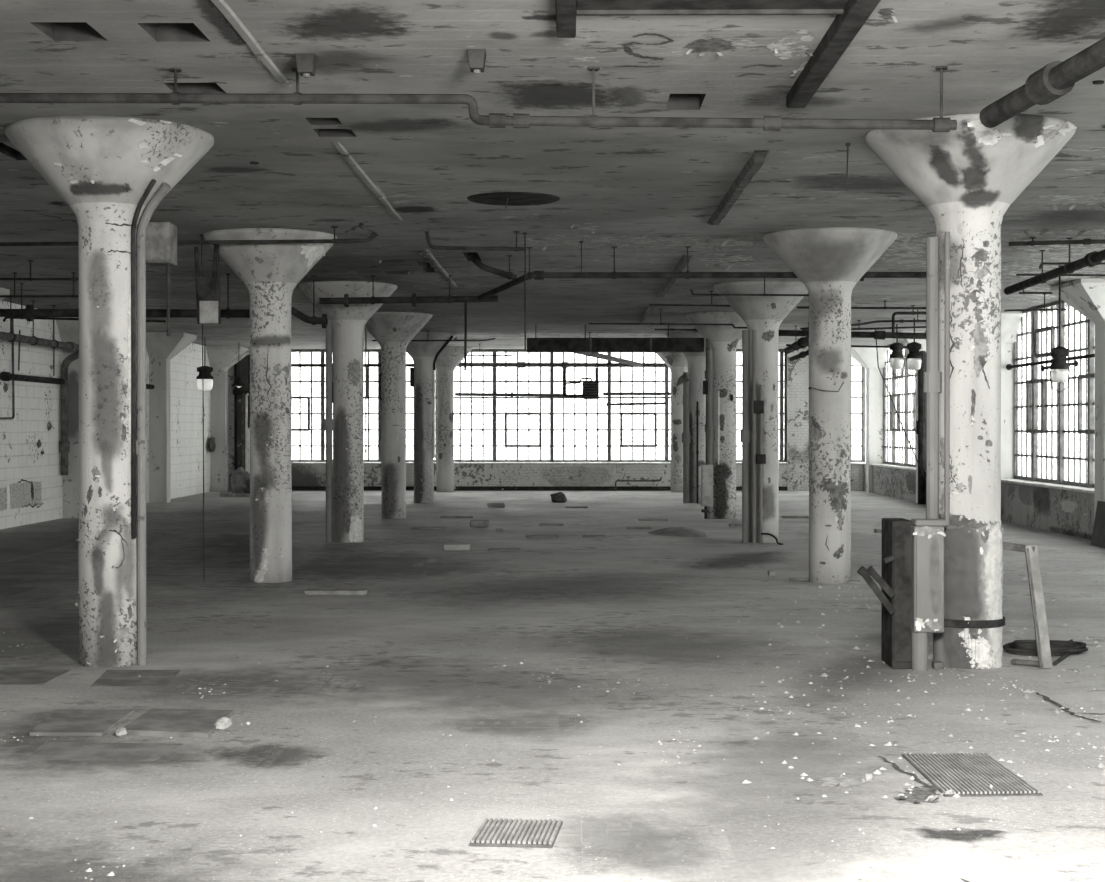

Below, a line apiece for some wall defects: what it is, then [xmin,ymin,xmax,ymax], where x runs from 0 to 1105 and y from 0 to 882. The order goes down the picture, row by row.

leakage [290,8,398,41]
leakage [1015,0,1105,39]
leakage [316,52,368,69]
leakage [503,82,642,109]
leakage [887,119,998,208]
leakage [91,254,131,489]
peeling [273,363,290,385]
peeling [26,391,54,463]
peeling [810,416,826,448]
peeling [76,466,122,557]
peeling [785,459,849,530]
peeling [913,514,998,555]